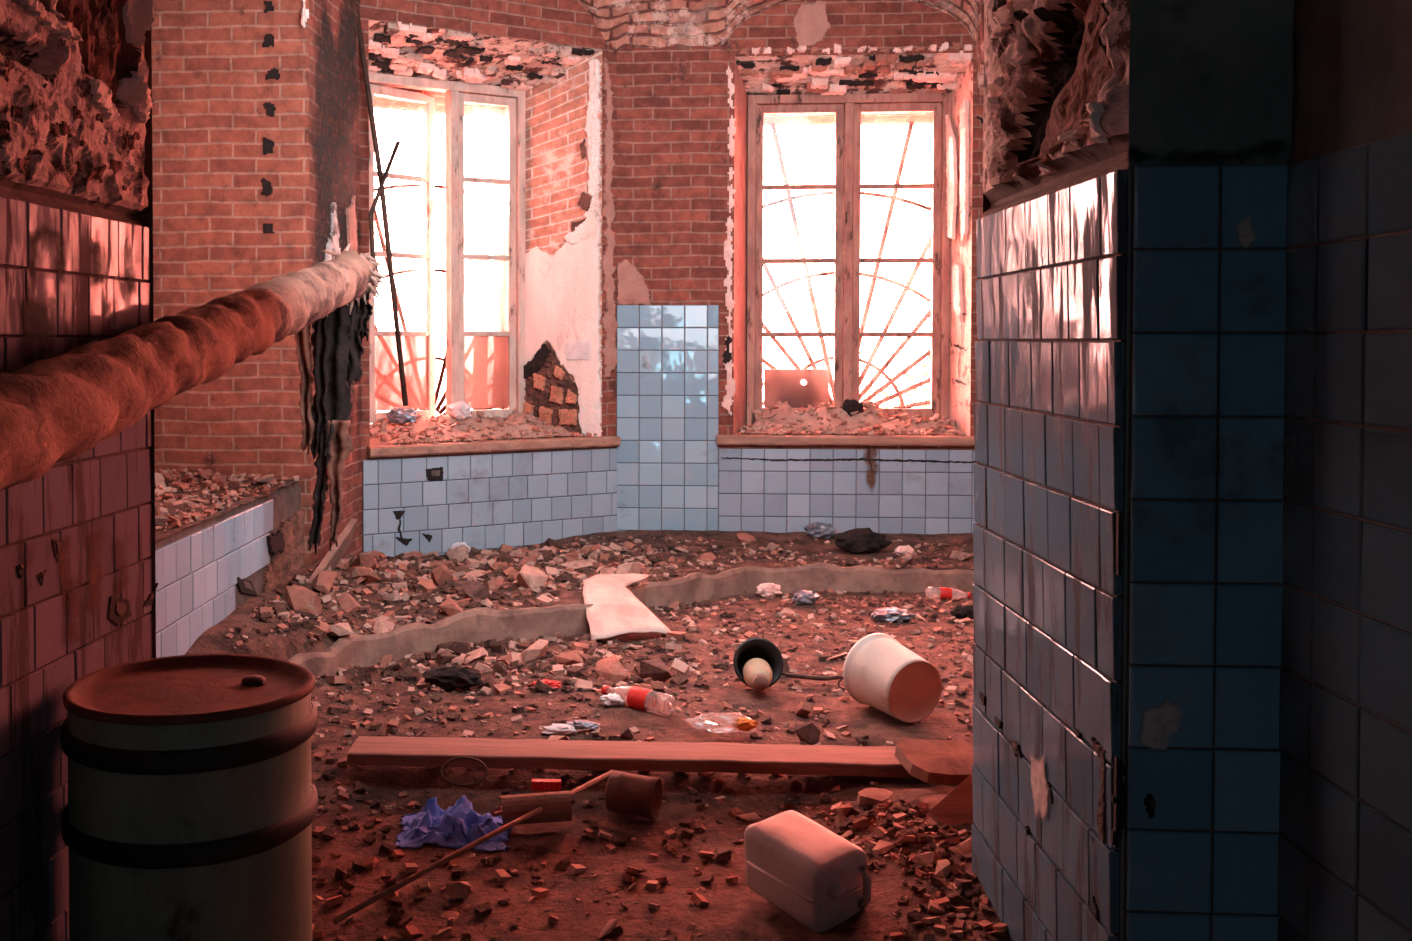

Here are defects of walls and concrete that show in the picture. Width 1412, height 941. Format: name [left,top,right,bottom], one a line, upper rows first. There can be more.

flaking render [17,0,155,191]
flaking render [369,21,651,437]
spalling [722,42,972,415]
flaking render [985,0,1113,176]